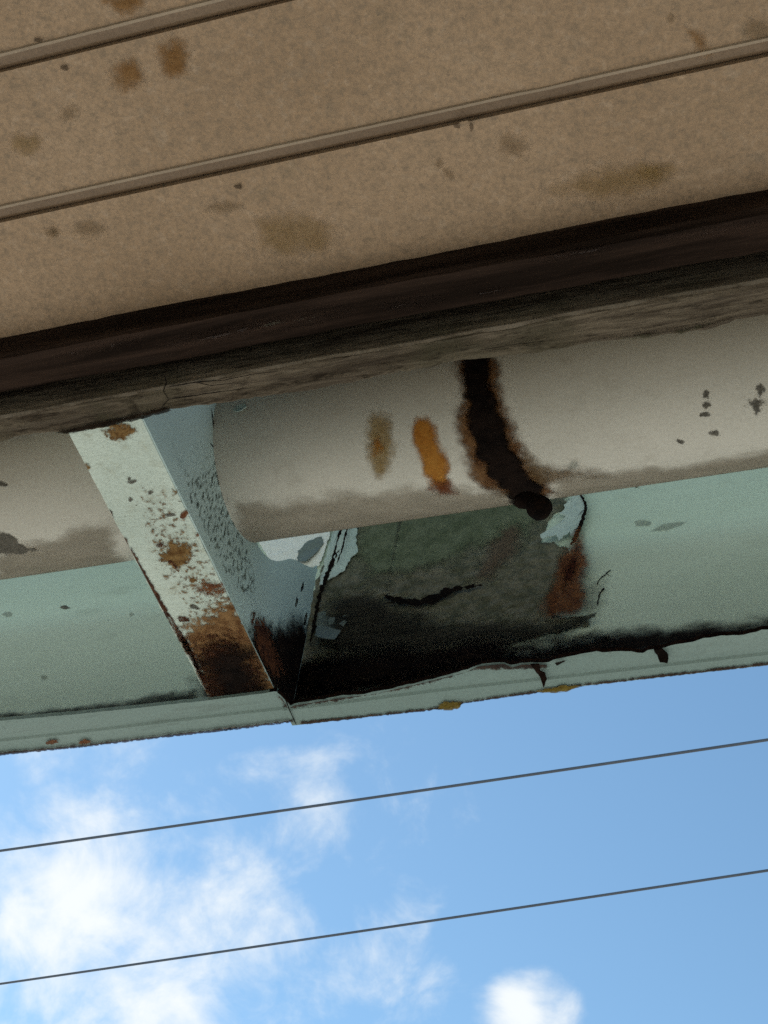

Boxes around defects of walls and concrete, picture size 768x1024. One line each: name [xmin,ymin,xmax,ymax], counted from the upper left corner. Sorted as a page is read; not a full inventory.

rust [101,423,137,441]
rust [370,417,391,474]
rust [413,419,453,494]
rust [457,358,580,521]
rust [0,492,768,756]
peeling [259,494,597,662]